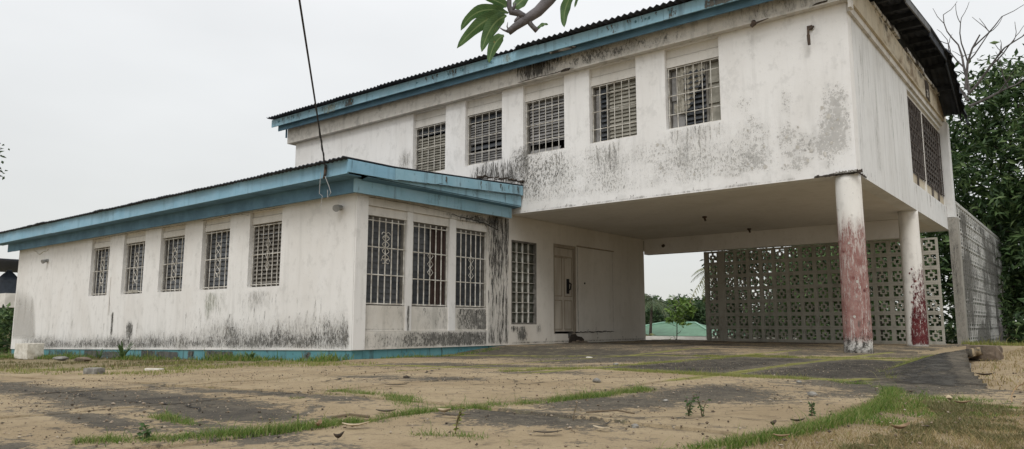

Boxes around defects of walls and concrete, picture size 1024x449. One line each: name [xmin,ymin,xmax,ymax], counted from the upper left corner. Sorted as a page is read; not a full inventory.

water stain [472,143,634,208]
water stain [380,214,569,347]
water stain [30,312,349,348]